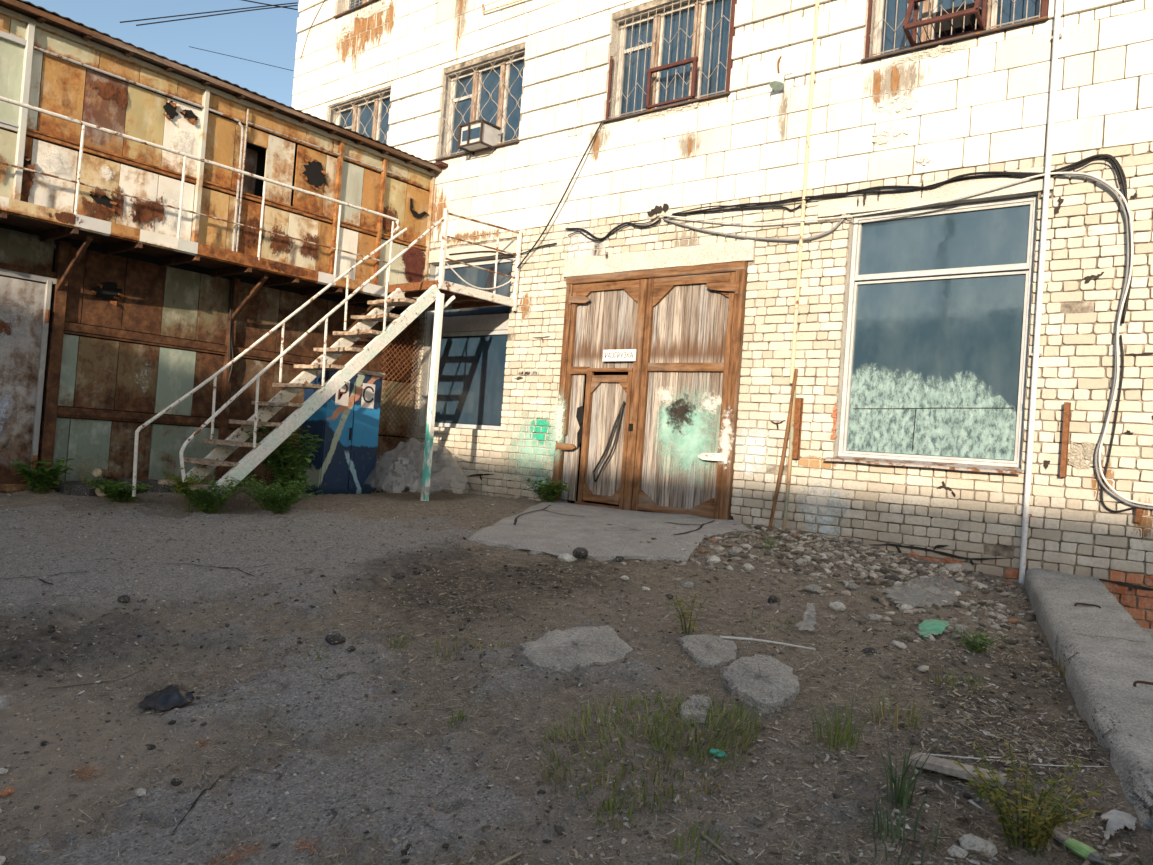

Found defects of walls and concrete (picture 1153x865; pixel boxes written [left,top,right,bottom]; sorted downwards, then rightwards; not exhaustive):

rust [336,0,395,68]
rust [454,0,467,53]
peeling [163,100,198,125]
rust [47,186,165,228]
rust [240,218,319,276]
rust [0,319,12,336]